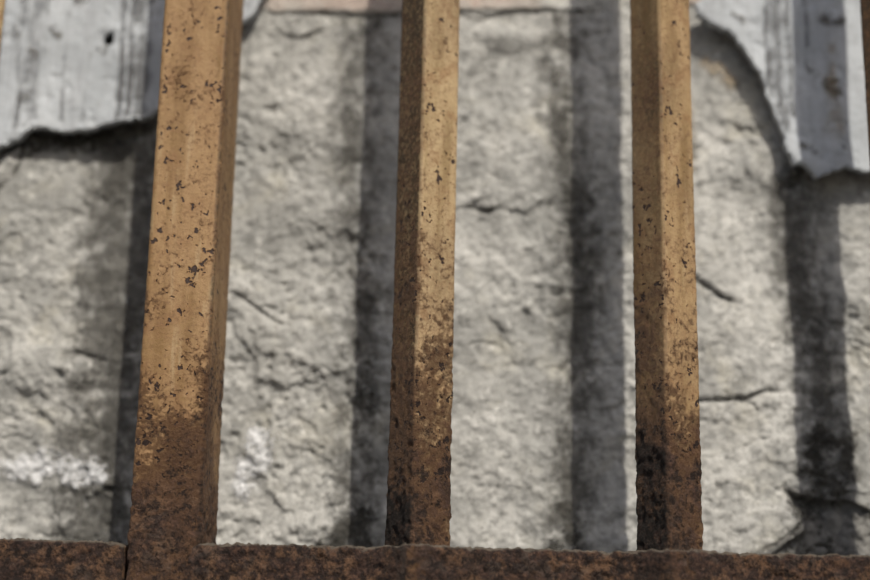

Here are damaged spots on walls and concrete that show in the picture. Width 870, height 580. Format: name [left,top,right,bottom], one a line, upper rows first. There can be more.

flaking render [0,0,165,183]
water stain [339,14,382,166]
flaking render [689,0,870,180]
water stain [0,0,157,542]
water stain [315,197,379,548]
water stain [540,10,603,550]
water stain [769,166,860,554]